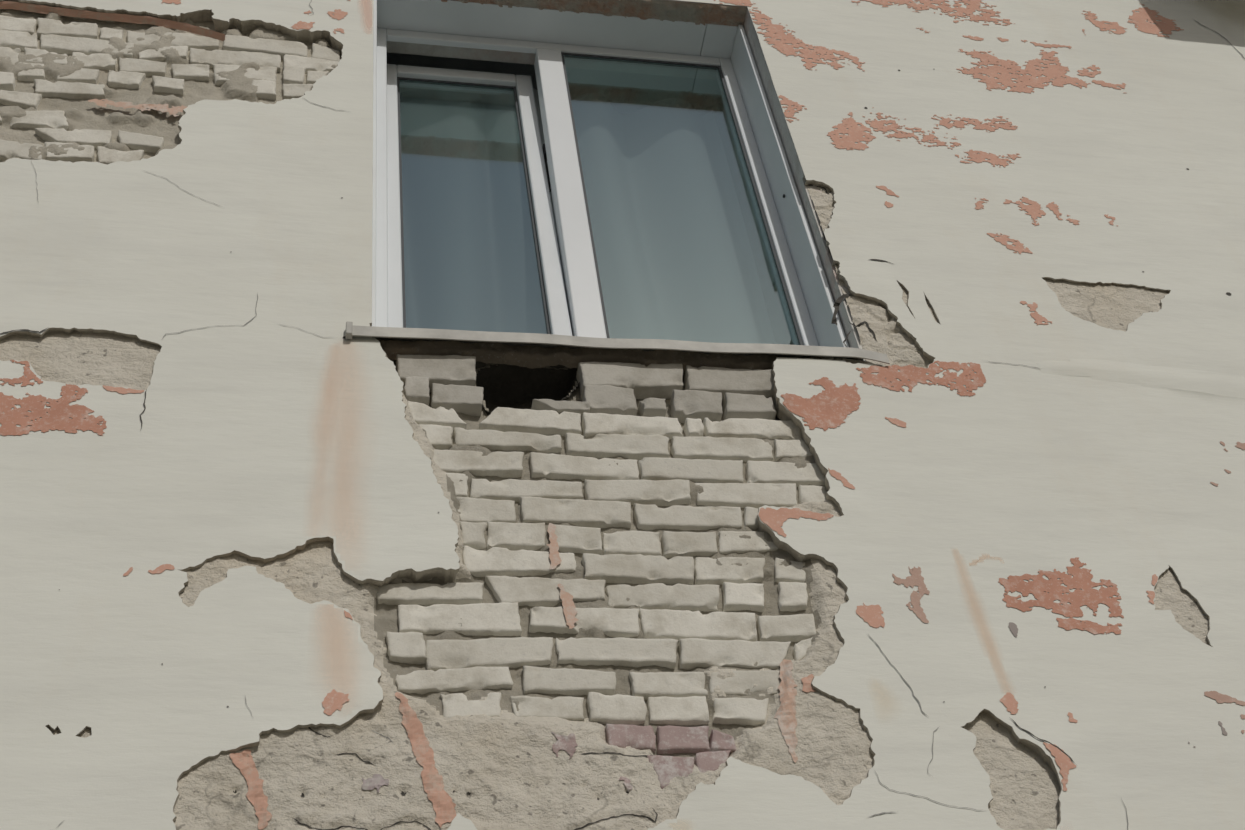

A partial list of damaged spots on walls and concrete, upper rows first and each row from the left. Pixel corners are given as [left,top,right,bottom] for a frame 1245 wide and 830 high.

spalling [0,0,350,165]
spalling [441,0,865,71]
peeling [852,0,1126,93]
peeling [1081,3,1184,37]
peeling [827,107,1020,167]
crack [162,294,326,339]
spalling [1042,271,1171,332]
spalling [0,328,162,436]
spalling [148,180,986,830]
peeling [998,557,1124,637]
spalling [1146,566,1213,647]
spalling [962,692,1076,830]